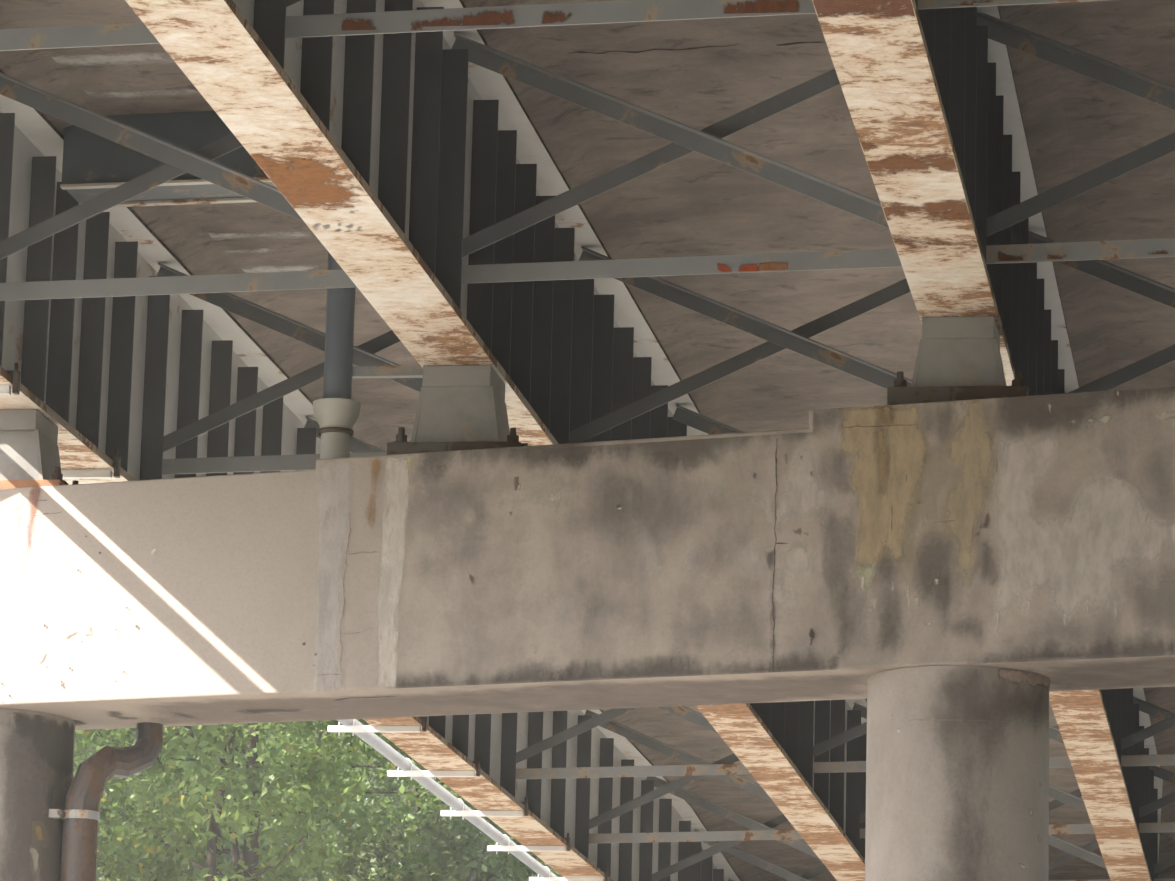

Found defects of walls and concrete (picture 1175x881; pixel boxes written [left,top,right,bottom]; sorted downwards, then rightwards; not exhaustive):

rust [411,10,514,30]
rust [724,0,799,14]
rust [813,0,915,19]
rust [860,140,957,176]
rust [251,150,364,210]
rust [882,199,970,221]
leakage [488,443,595,463]
crack [772,439,789,666]
leakage [378,459,448,688]
leakage [992,641,1175,663]
leakage [466,649,716,685]
leakage [730,656,825,674]